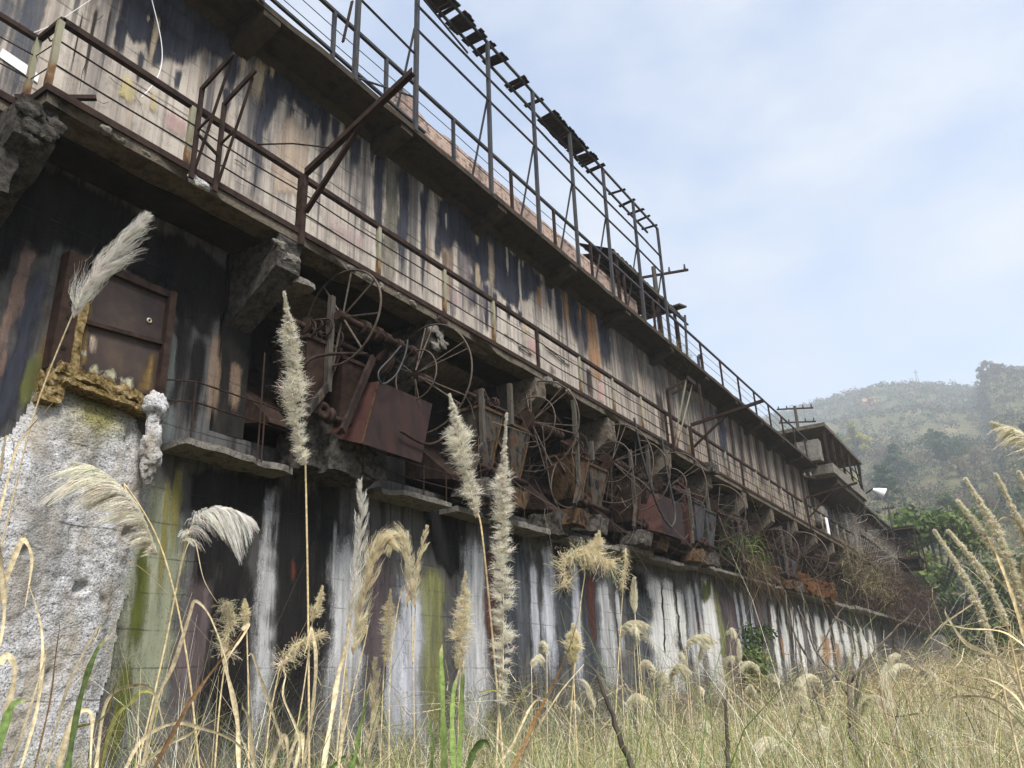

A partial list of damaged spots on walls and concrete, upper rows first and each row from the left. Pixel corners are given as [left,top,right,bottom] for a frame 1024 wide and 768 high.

spalling [15,98,68,147]
damp [0,167,233,436]
damp [72,0,871,559]
rust [563,292,601,377]
damp [110,468,897,757]
crack [660,578,681,652]